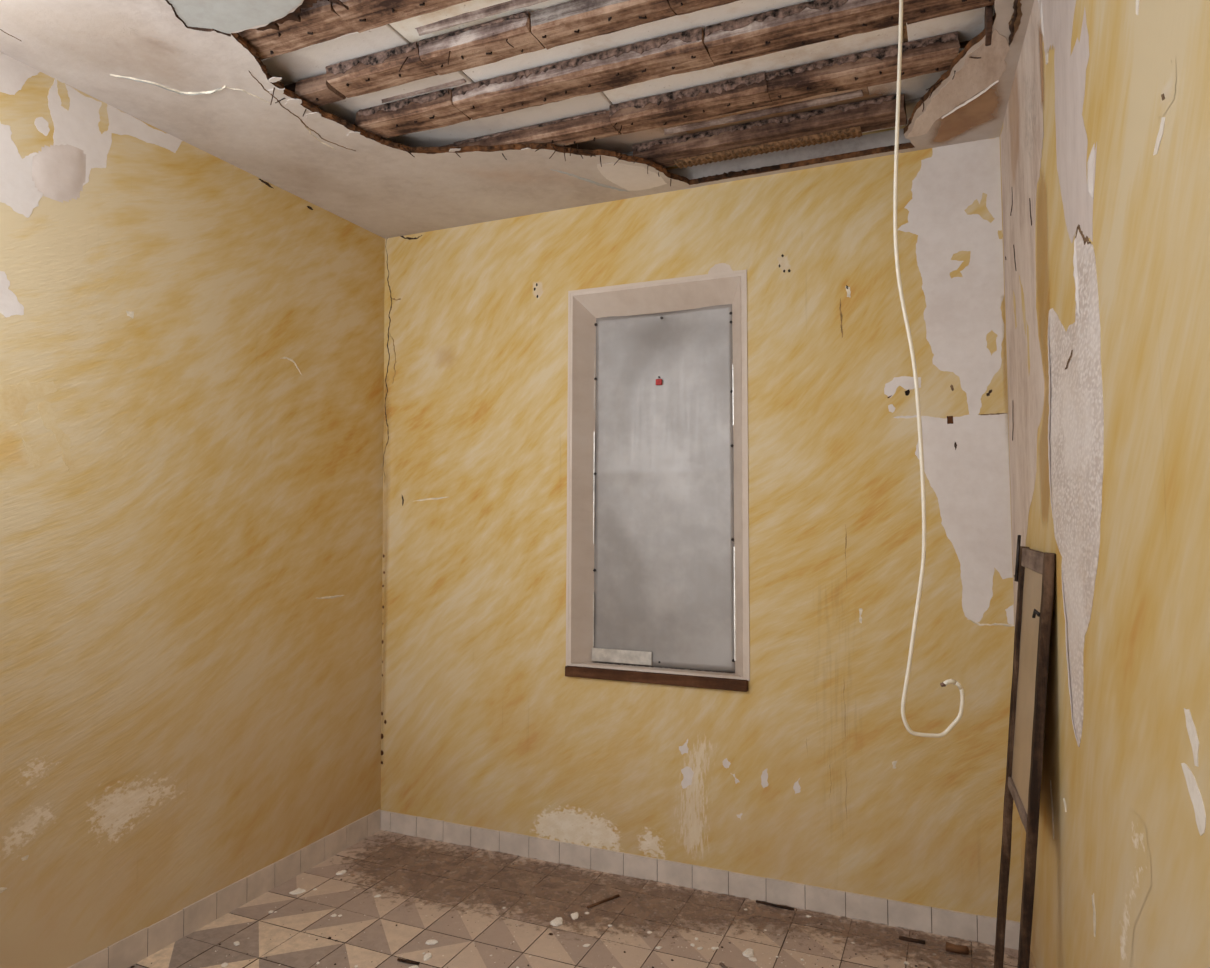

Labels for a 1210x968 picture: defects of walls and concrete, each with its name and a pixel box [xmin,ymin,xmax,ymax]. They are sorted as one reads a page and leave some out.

peeling [0,122,43,218]
peeling [0,52,182,185]
flaking render [168,0,671,191]
flaking render [698,165,779,182]
peeling [0,271,24,317]
peeling [884,0,1104,747]
peeling [524,718,742,869]
peeling [1181,708,1206,836]